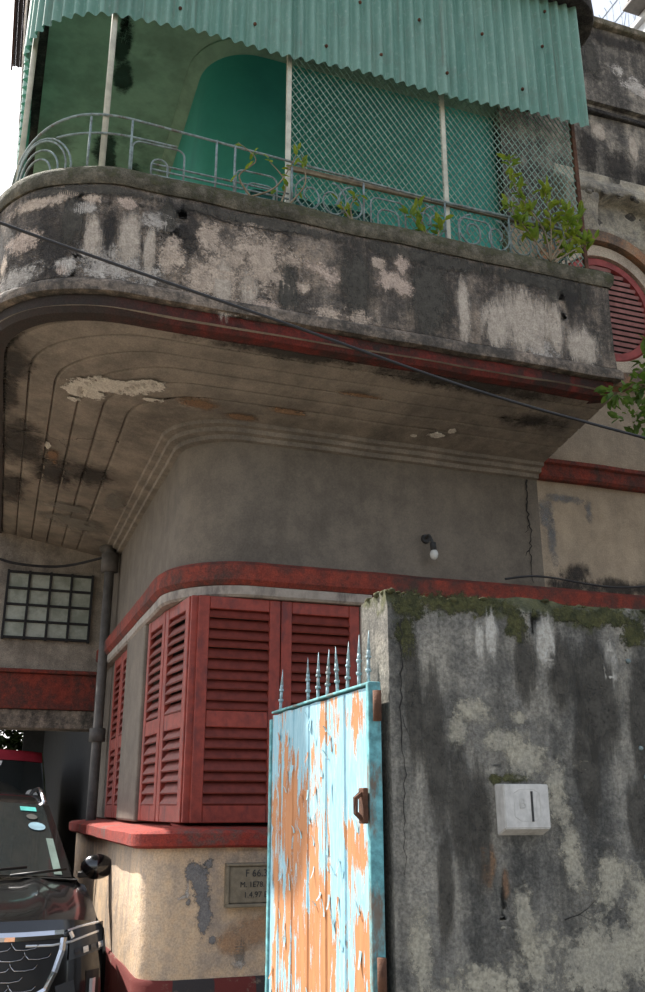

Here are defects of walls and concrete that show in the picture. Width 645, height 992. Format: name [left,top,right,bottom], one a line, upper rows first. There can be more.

leakage [0,184,338,293]
leakage [279,259,299,312]
leakage [341,241,597,364]
leakage [3,339,35,410]
peeling [60,375,168,403]
leakage [215,341,354,366]
leakage [375,367,542,400]
leakage [1,419,107,503]
crack [525,479,534,583]
leakage [475,615,497,656]
leakage [514,619,645,848]
leakage [405,641,491,942]